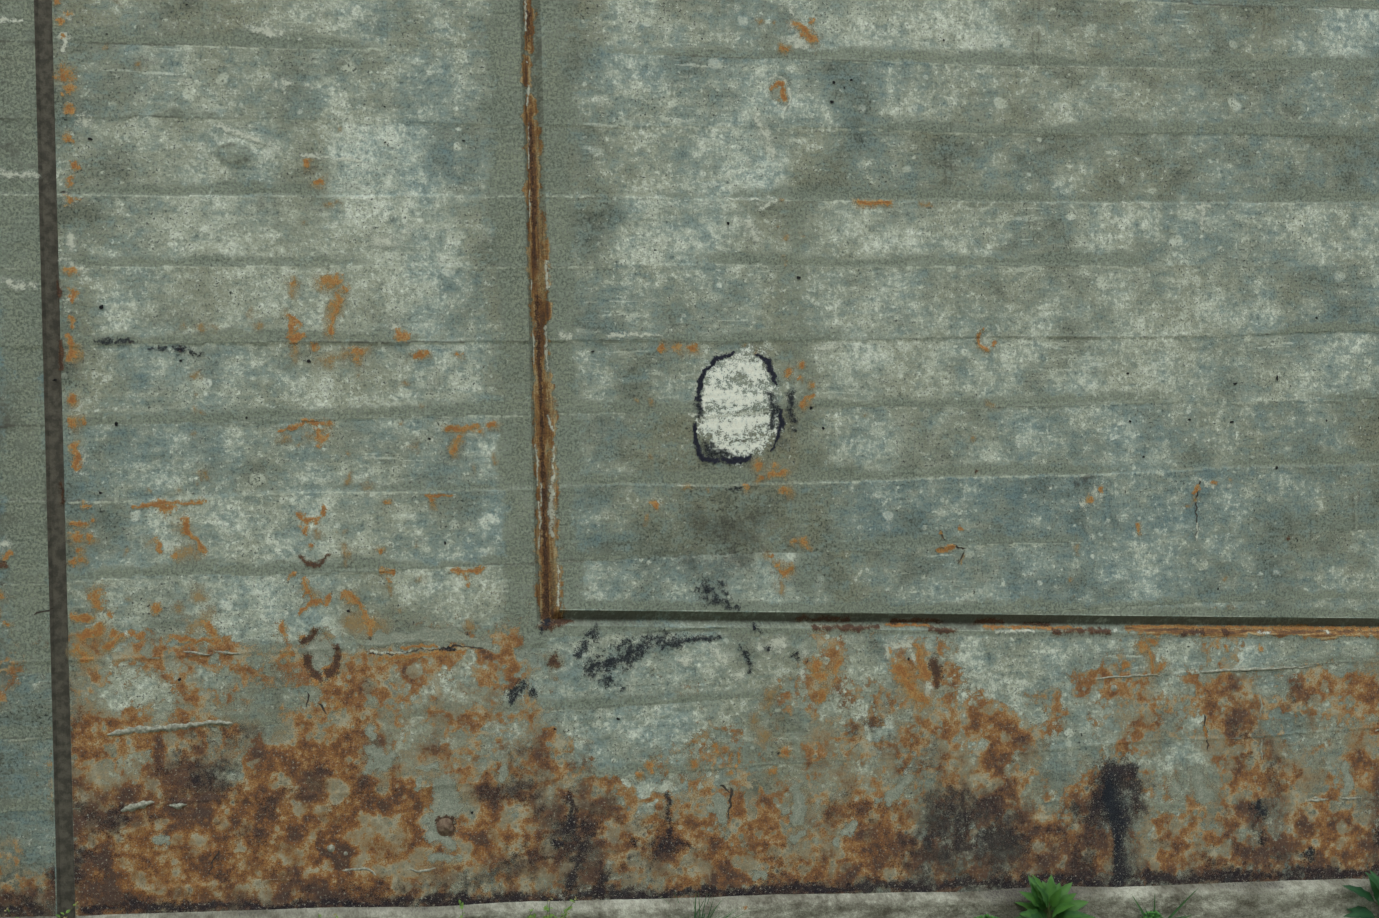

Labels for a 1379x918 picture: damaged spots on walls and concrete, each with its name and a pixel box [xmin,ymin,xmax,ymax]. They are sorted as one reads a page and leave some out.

rust [53,0,92,143]
rust [755,5,819,54]
rust [56,232,84,371]
rust [284,272,371,377]
rust [383,320,430,360]
rust [520,0,574,634]
rust [59,393,100,567]
rust [278,418,335,448]
rust [294,504,350,568]
rust [441,421,498,457]
rust [66,571,1379,916]
leakage [81,759,1379,914]